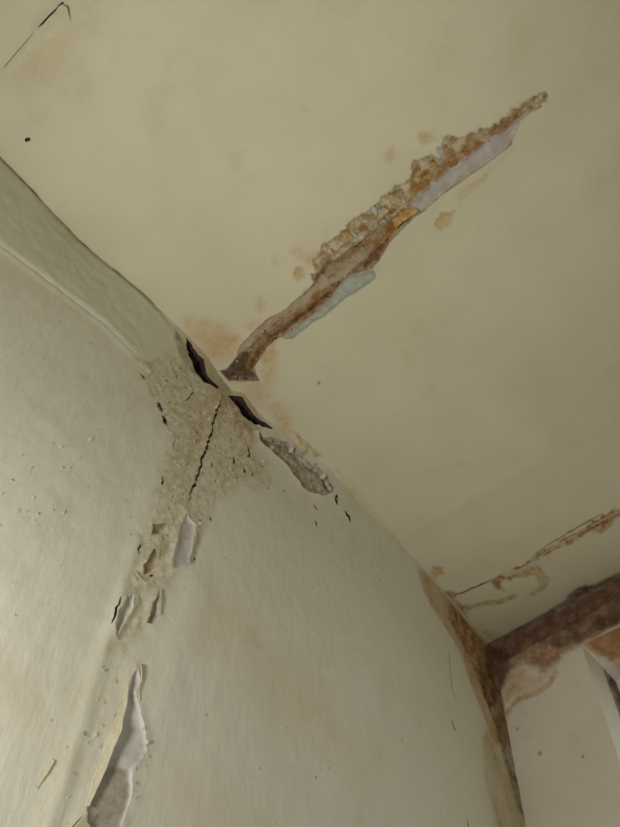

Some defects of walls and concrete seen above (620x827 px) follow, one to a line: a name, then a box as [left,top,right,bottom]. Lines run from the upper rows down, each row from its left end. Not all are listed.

flaking render [220,94,547,382]
crack [177,333,273,504]
flaking render [111,361,339,639]
peeling [72,664,148,827]